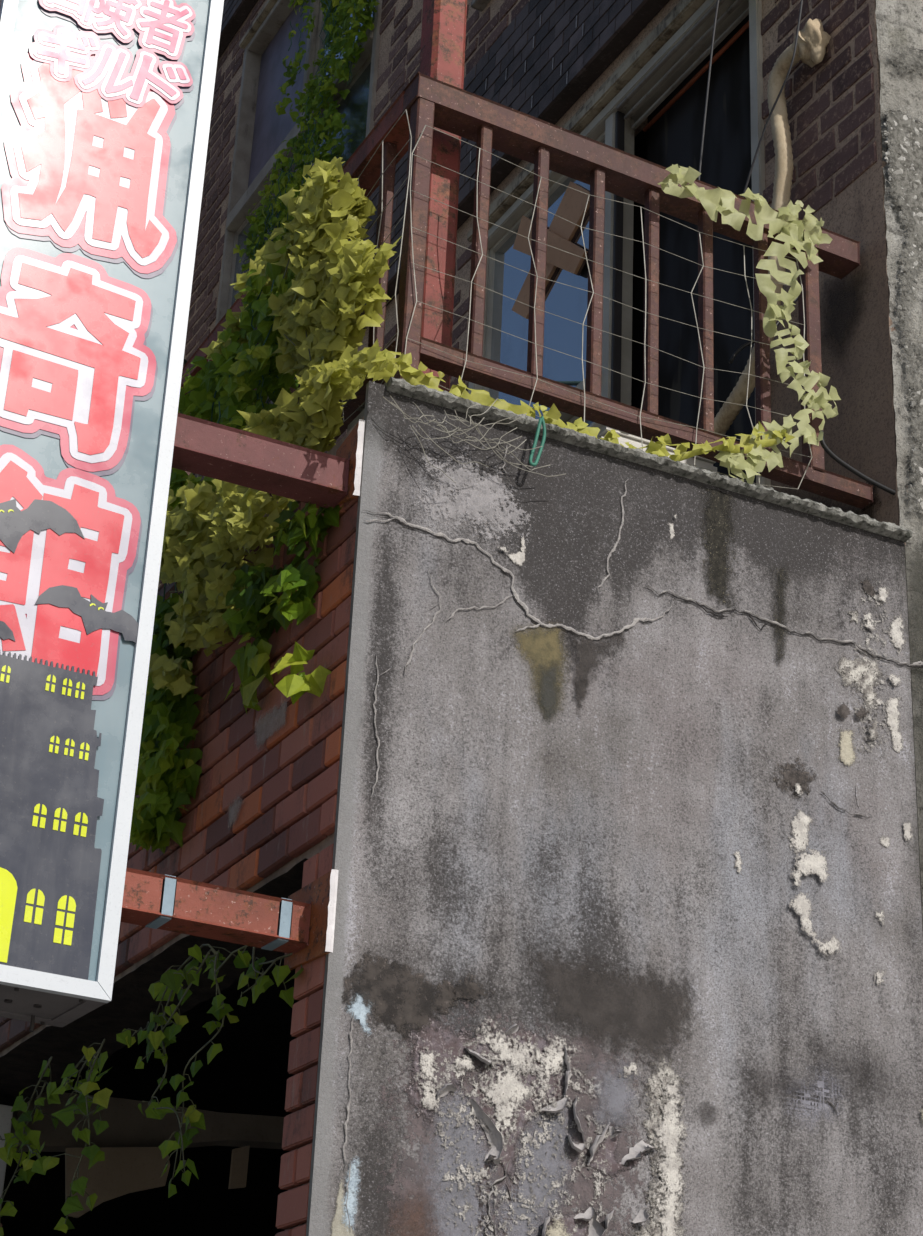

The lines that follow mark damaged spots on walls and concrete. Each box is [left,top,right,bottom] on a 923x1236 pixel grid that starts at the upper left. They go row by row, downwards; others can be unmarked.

crack [597,481,627,595]
damp [700,488,735,614]
damp [516,627,625,719]
crack [364,510,923,798]
damp [772,567,790,664]
spalling [829,577,907,771]
crack [821,788,865,817]
damp [342,950,495,1047]
damp [527,946,695,1067]
peeling [369,1001,694,1236]
damp [342,1158,360,1228]